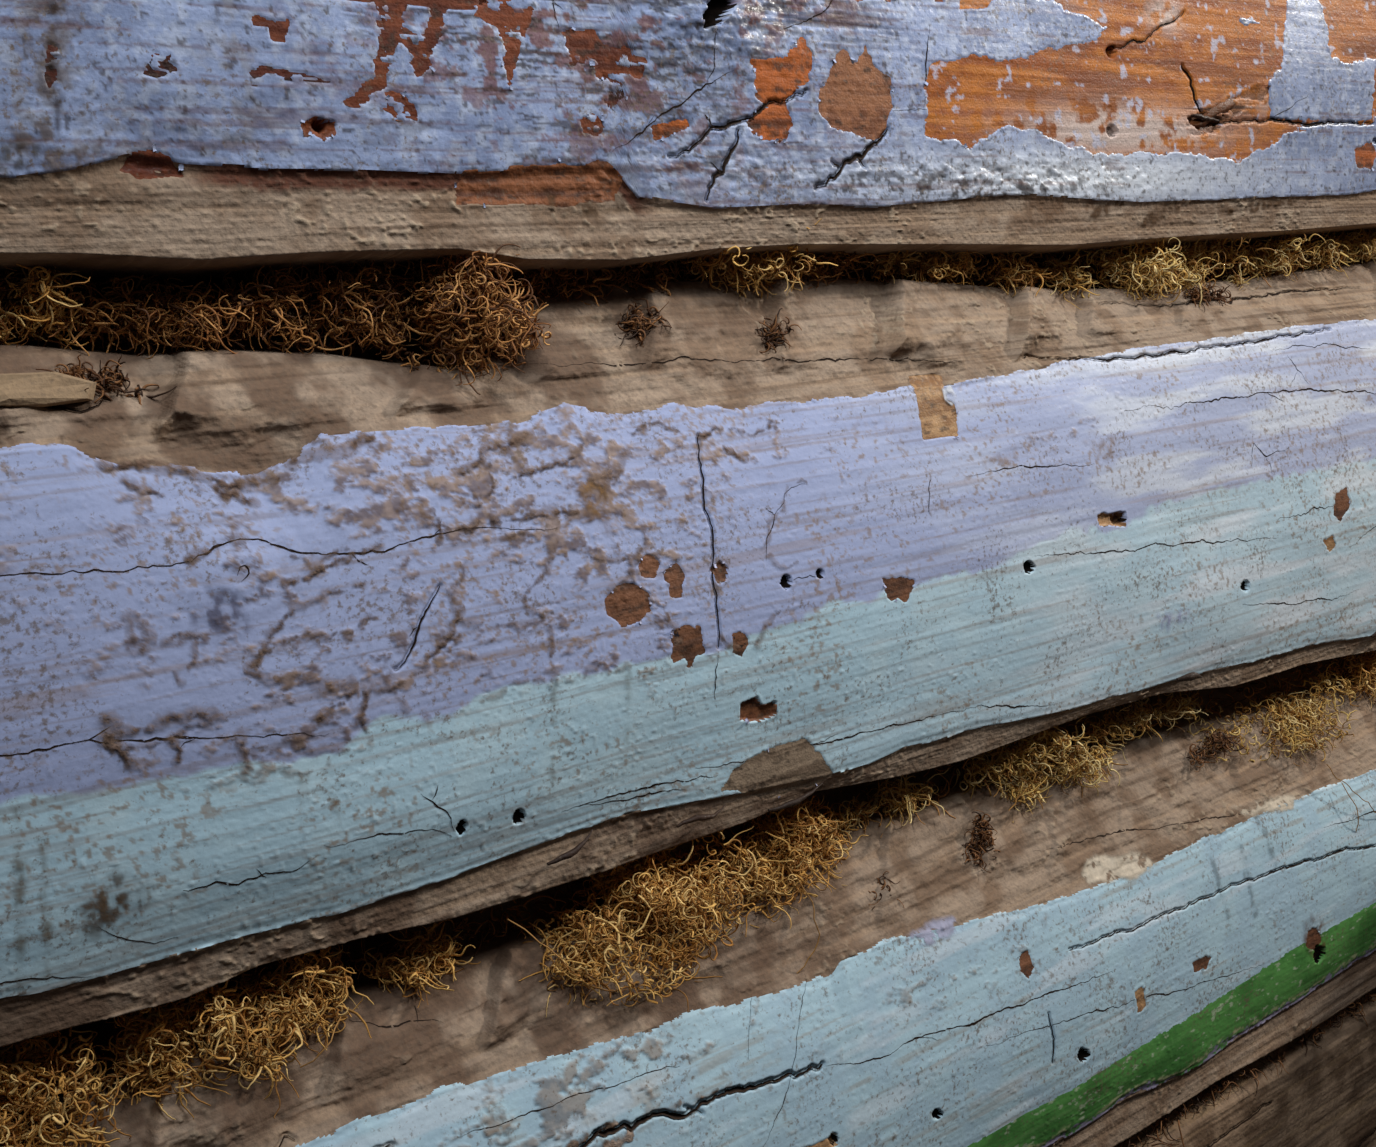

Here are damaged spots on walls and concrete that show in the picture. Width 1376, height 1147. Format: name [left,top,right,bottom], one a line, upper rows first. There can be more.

peeling [343,0,534,121]
peeling [561,26,648,136]
crack [615,24,807,200]
crack [816,26,930,187]
peeling [924,0,1334,163]
crack [1181,66,1376,142]
peeling [1319,0,1376,171]
peeling [909,374,959,440]
crack [0,526,555,582]
peeling [604,554,685,627]
crack [697,435,720,700]
crack [581,810,1376,1147]